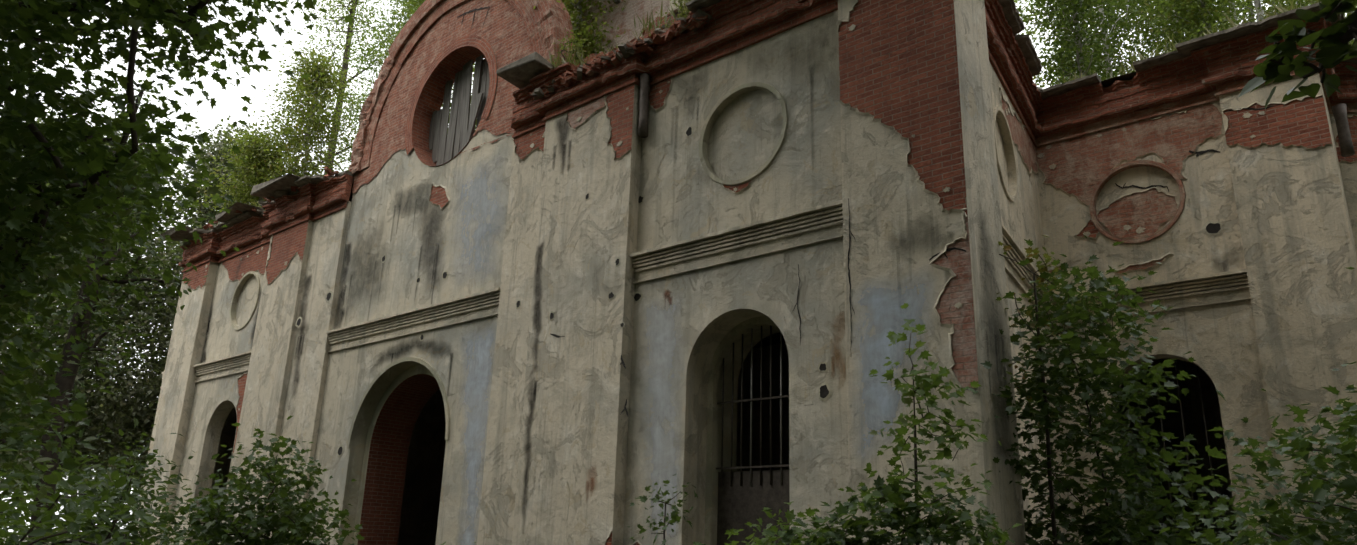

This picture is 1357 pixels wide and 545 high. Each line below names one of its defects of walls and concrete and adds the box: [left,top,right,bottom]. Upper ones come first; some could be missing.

peeling [429,183,450,211]
peeling [513,125,546,162]
peeling [566,78,673,160]
peeling [838,0,978,390]
peeling [999,87,1357,240]
peeling [182,221,308,291]